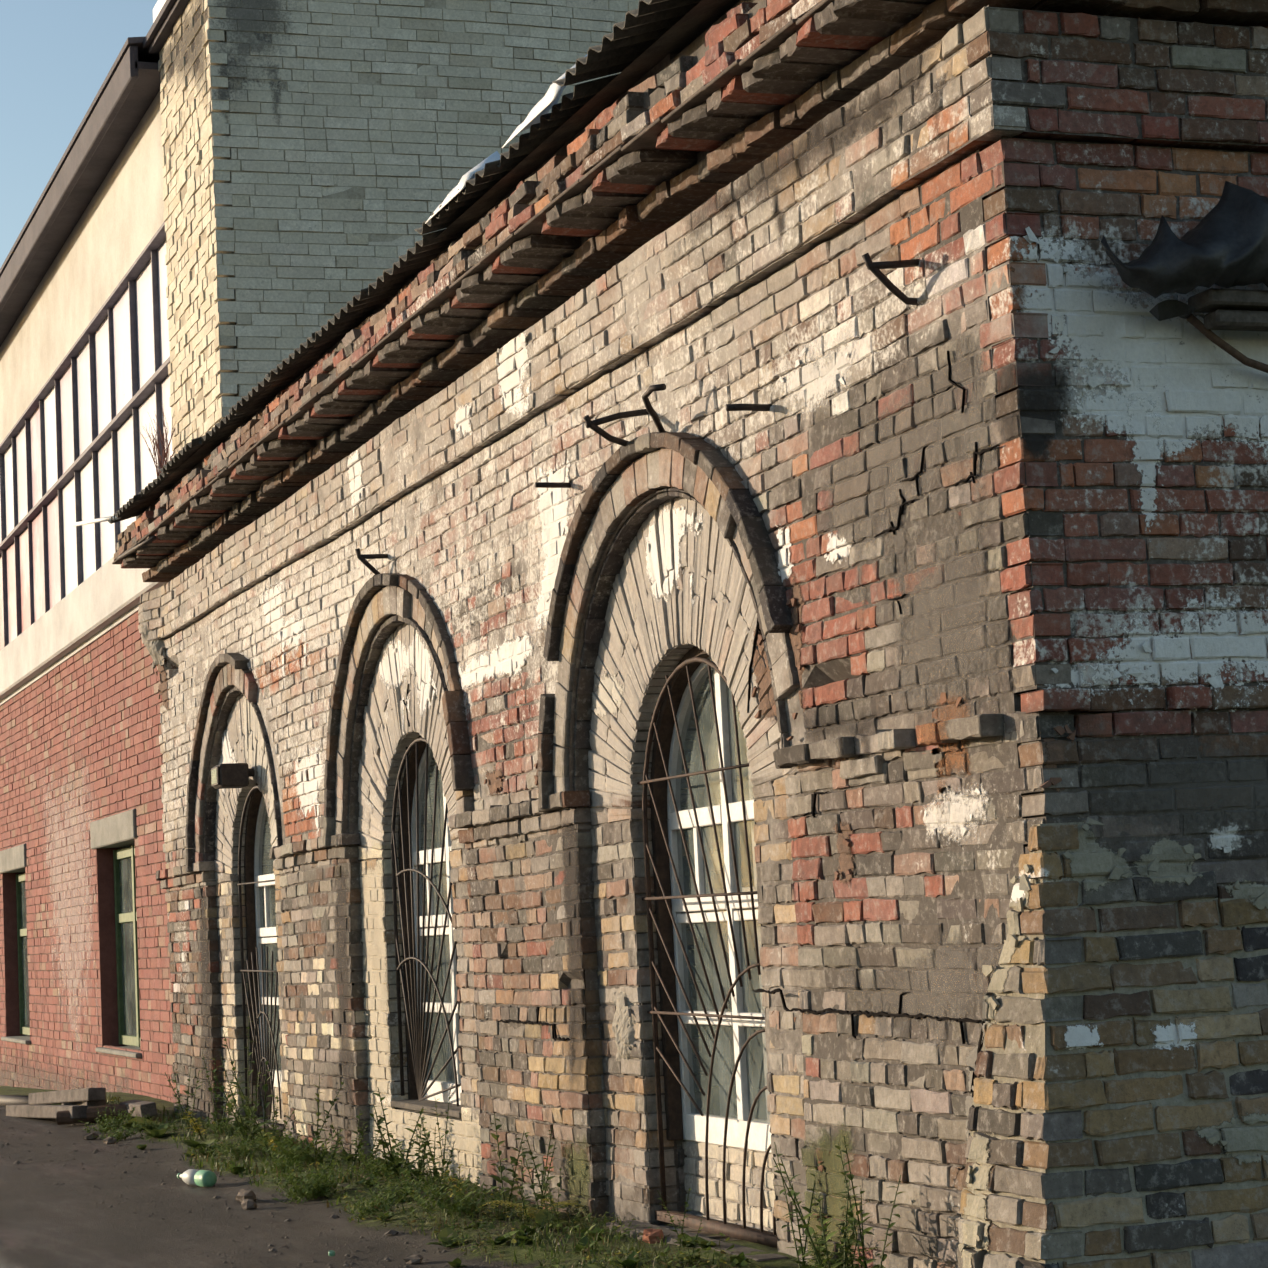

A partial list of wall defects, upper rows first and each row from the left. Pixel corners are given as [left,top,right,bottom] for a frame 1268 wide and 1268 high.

leakage [161,0,290,122]
peeling [347,450,365,519]
peeling [454,402,472,437]
peeling [495,330,531,418]
crack [873,446,928,538]
crack [945,351,966,413]
crack [950,442,1000,486]
peeling [1009,226,1268,542]
peeling [458,458,570,690]
peeling [1044,590,1268,712]
peeling [1010,864,1048,913]
crack [751,988,985,1097]